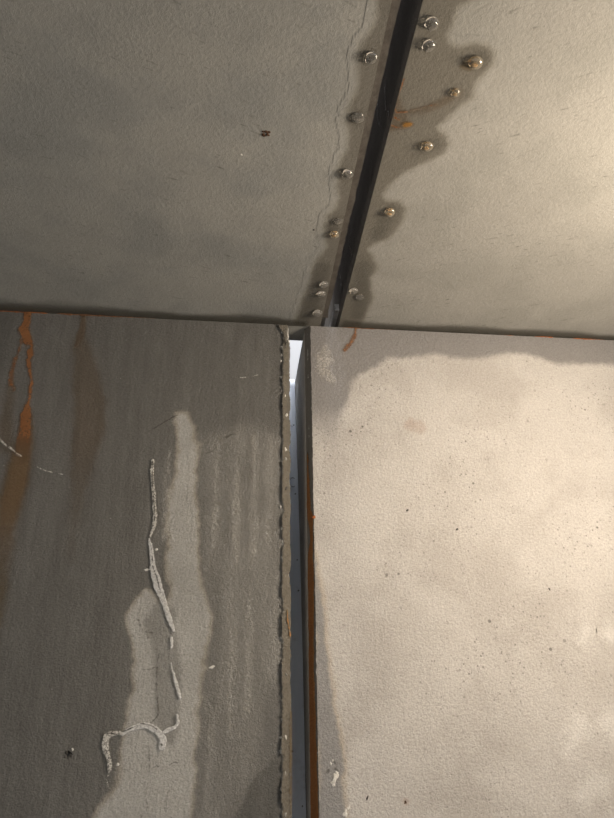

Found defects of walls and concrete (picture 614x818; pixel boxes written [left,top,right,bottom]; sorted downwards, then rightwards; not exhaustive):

corrosion [0,311,47,532]
crack [0,438,64,475]
crack [102,459,181,785]
water stain [0,305,305,818]
corrosion [304,326,319,818]
water stain [290,0,614,455]